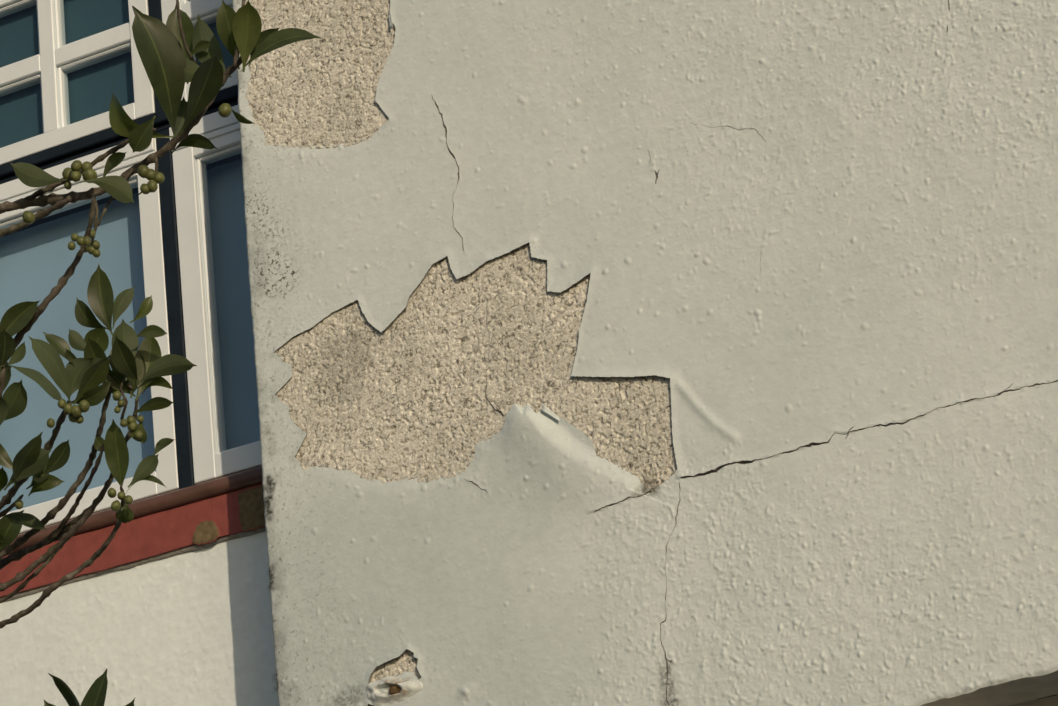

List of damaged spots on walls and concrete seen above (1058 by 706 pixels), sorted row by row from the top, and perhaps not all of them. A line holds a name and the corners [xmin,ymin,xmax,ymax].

peeling [245,0,395,149]
crack [432,97,464,251]
peeling [274,242,677,489]
crack [594,490,651,513]
crack [660,380,1058,706]
spalling [368,649,421,684]